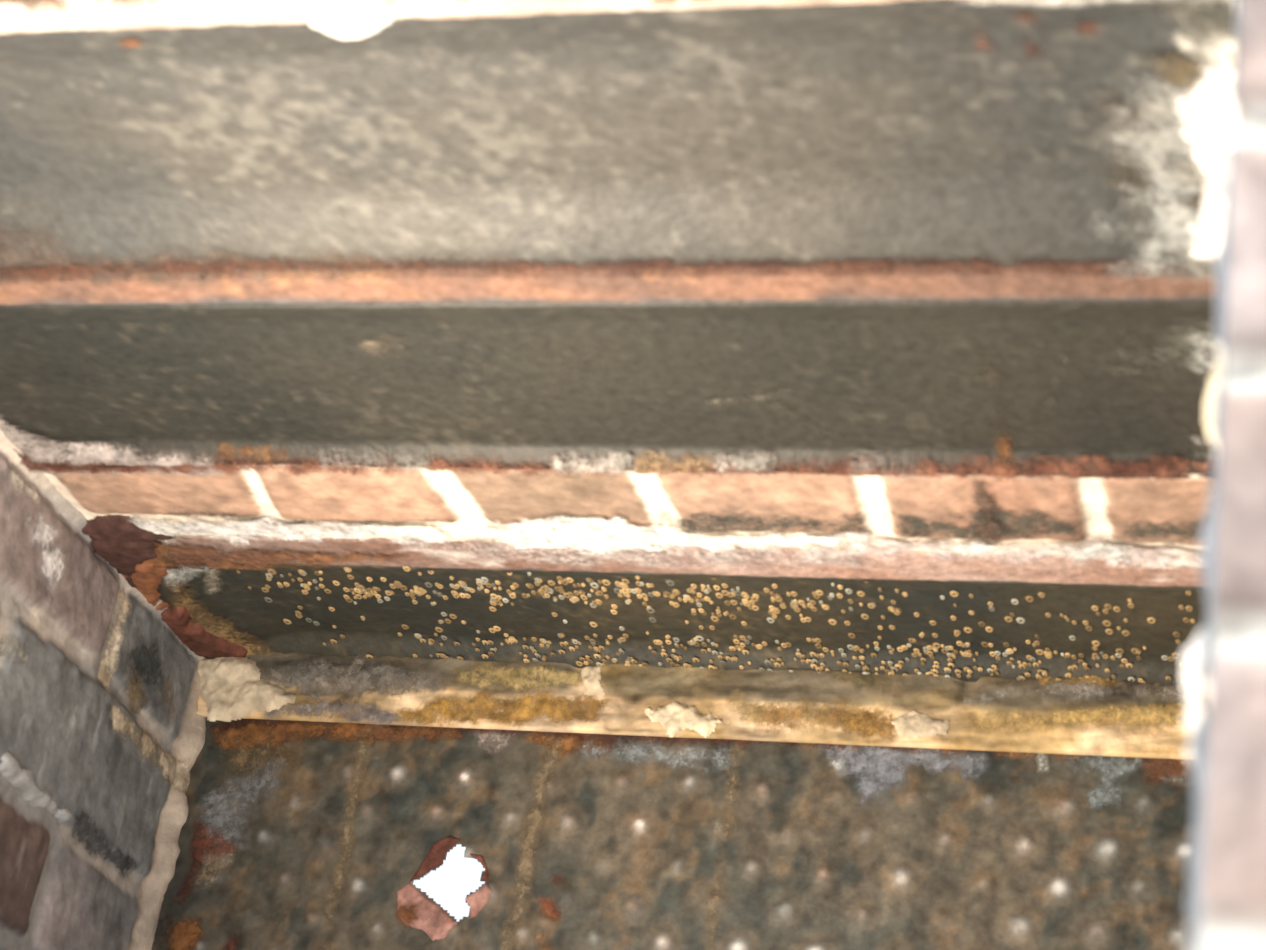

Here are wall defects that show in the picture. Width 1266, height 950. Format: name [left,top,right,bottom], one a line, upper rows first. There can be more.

efflorescence [1101,2,1236,279]
rust [0,232,1214,286]
efflorescence [1119,323,1219,373]
leakage [132,517,1201,950]
rust [1125,757,1193,783]
rust [177,821,235,900]
rust [160,915,201,950]